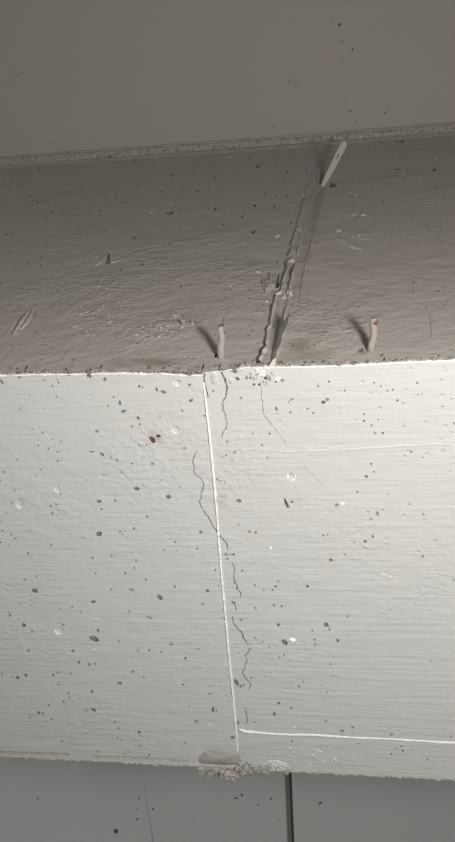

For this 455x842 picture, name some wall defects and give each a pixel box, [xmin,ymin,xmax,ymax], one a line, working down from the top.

crack [204,372,228,438]
crack [192,451,251,725]